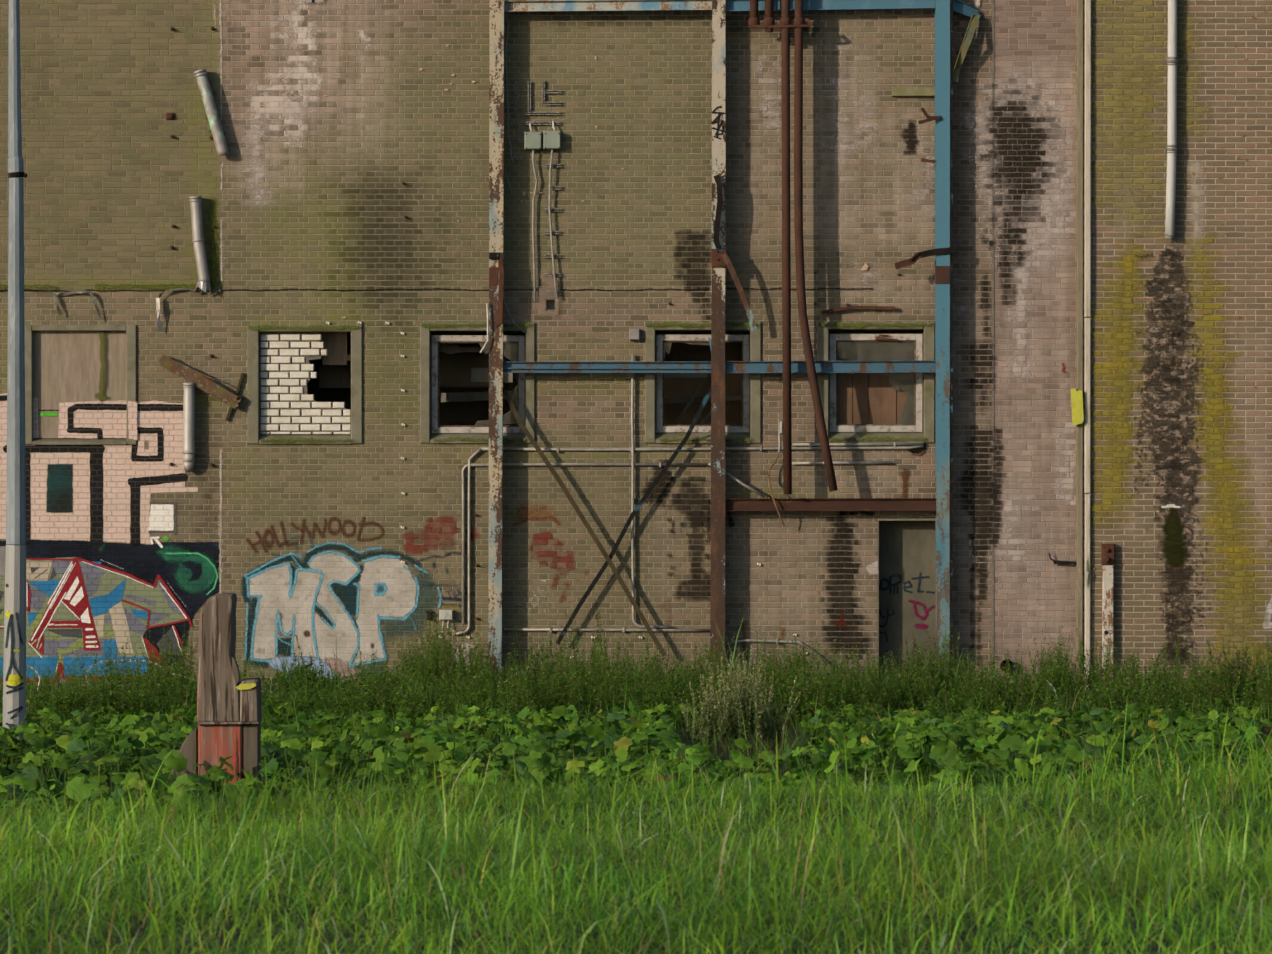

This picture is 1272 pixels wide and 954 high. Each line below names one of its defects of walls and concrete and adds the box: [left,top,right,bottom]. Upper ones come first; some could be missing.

damp [244,0,324,204]
damp [674,231,711,322]
damp [953,71,1076,406]
damp [667,477,711,600]
damp [821,511,874,659]
damp [959,426,1034,666]
damp [1056,423,1076,505]
damp [1111,161,1253,677]